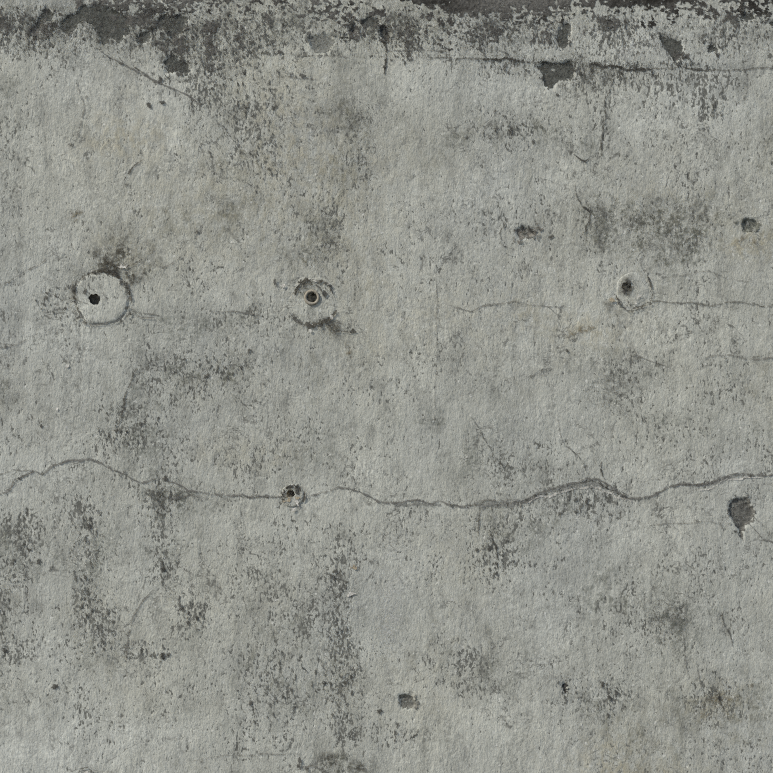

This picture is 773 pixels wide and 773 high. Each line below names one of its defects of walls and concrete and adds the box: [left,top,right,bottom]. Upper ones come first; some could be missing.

peeling [2,4,188,51]
peeling [158,55,190,84]
peeling [305,32,336,53]
peeling [347,16,393,43]
damp [0,0,773,86]
crack [371,18,463,74]
peeling [548,23,571,49]
peeling [523,32,720,96]
crack [483,57,719,163]
crack [616,275,653,309]
crack [0,458,773,560]
spalling [727,490,757,539]